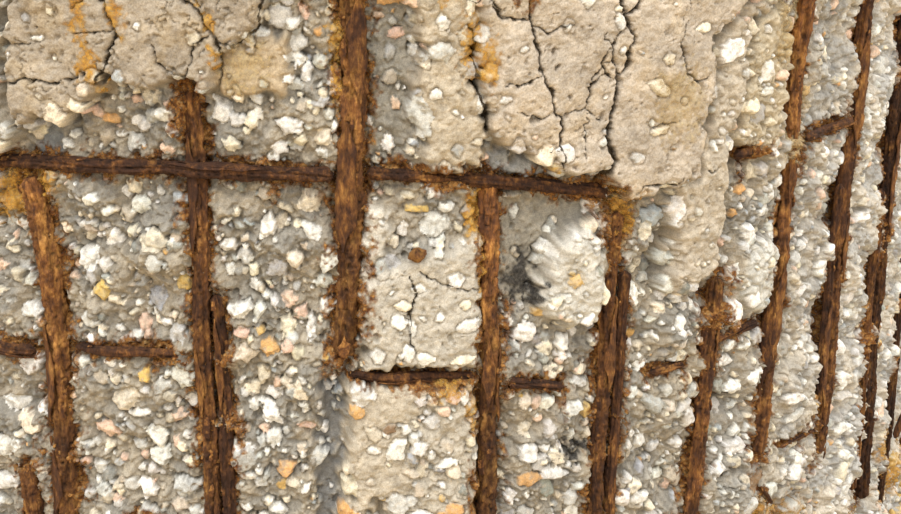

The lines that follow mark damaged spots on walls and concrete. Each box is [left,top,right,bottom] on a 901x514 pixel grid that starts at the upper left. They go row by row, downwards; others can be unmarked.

crack [9,0,119,84]
crack [153,0,264,82]
spalling [0,0,581,514]
rust [0,0,648,514]
crack [467,25,488,130]
crack [471,0,639,178]
spalling [496,0,901,514]
rust [773,0,799,63]
rust [728,58,863,247]
rust [810,169,853,353]
rust [855,100,896,369]
rust [604,265,824,514]